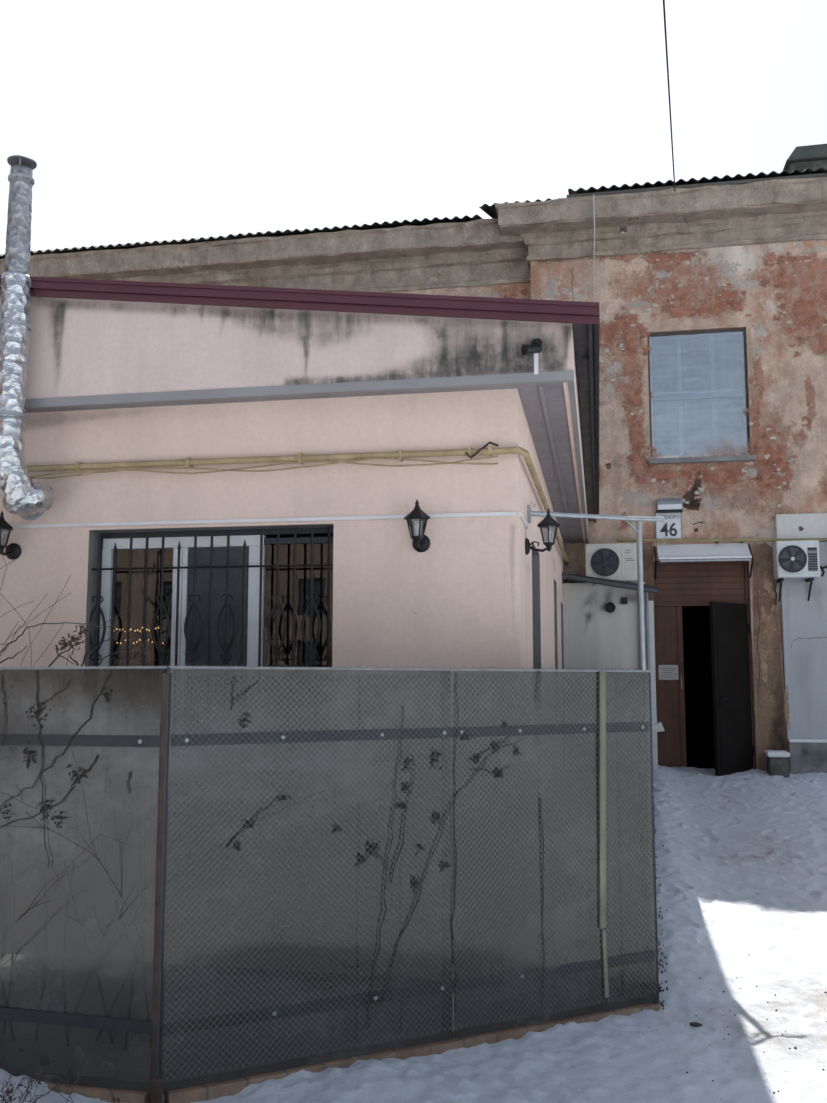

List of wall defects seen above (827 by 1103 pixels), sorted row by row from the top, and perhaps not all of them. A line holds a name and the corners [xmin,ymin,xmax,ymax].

water stain [423,346,531,370]
peeling [589,240,827,520]